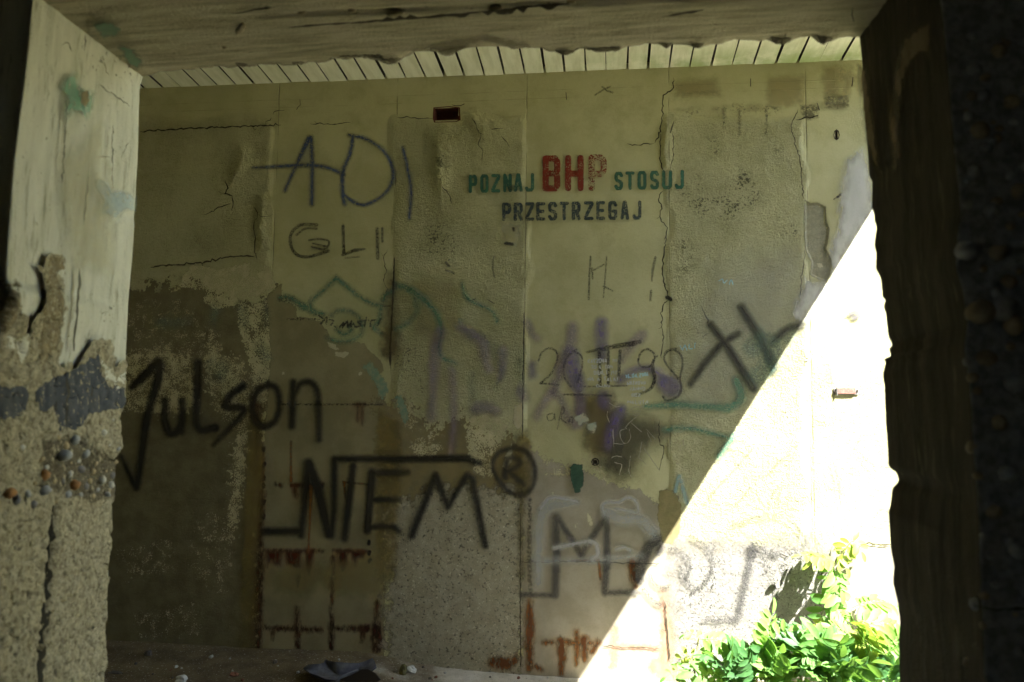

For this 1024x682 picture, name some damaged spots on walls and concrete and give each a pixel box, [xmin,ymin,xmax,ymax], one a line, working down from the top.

crack [61,100,284,223]
crack [152,182,268,268]
crack [627,78,674,356]
crack [791,110,818,198]
flaking render [804,200,832,301]
rust [254,441,382,653]
flaking render [0,253,900,682]
rust [489,499,677,682]